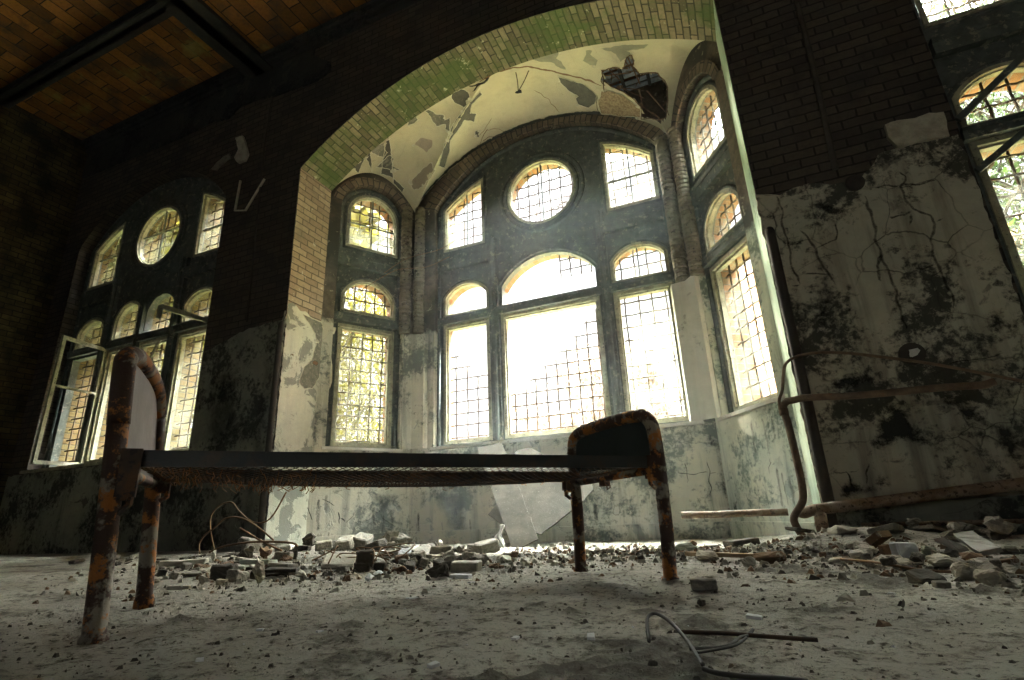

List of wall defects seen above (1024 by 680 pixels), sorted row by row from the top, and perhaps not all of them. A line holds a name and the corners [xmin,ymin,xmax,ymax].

flaking render [534,52,641,120]
flaking render [353,89,483,192]
crack [777,197,838,286]
crack [865,172,955,329]
flaking render [299,314,336,389]
damp [832,375,871,389]